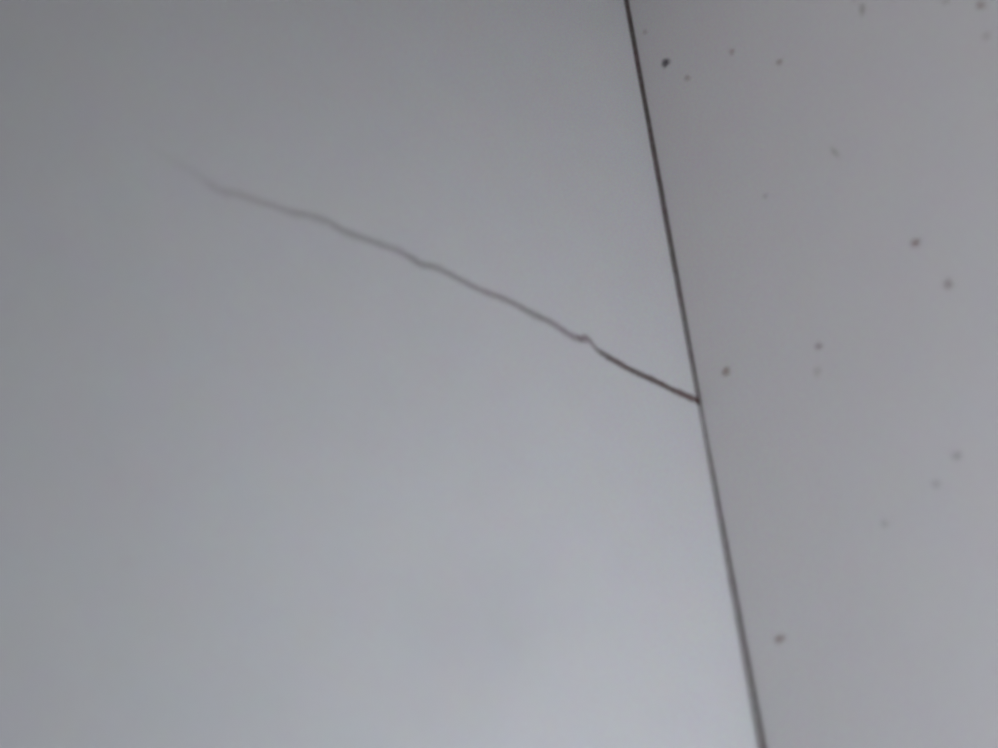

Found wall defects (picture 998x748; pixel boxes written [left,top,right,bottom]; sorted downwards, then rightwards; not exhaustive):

crack [604,354,699,402]